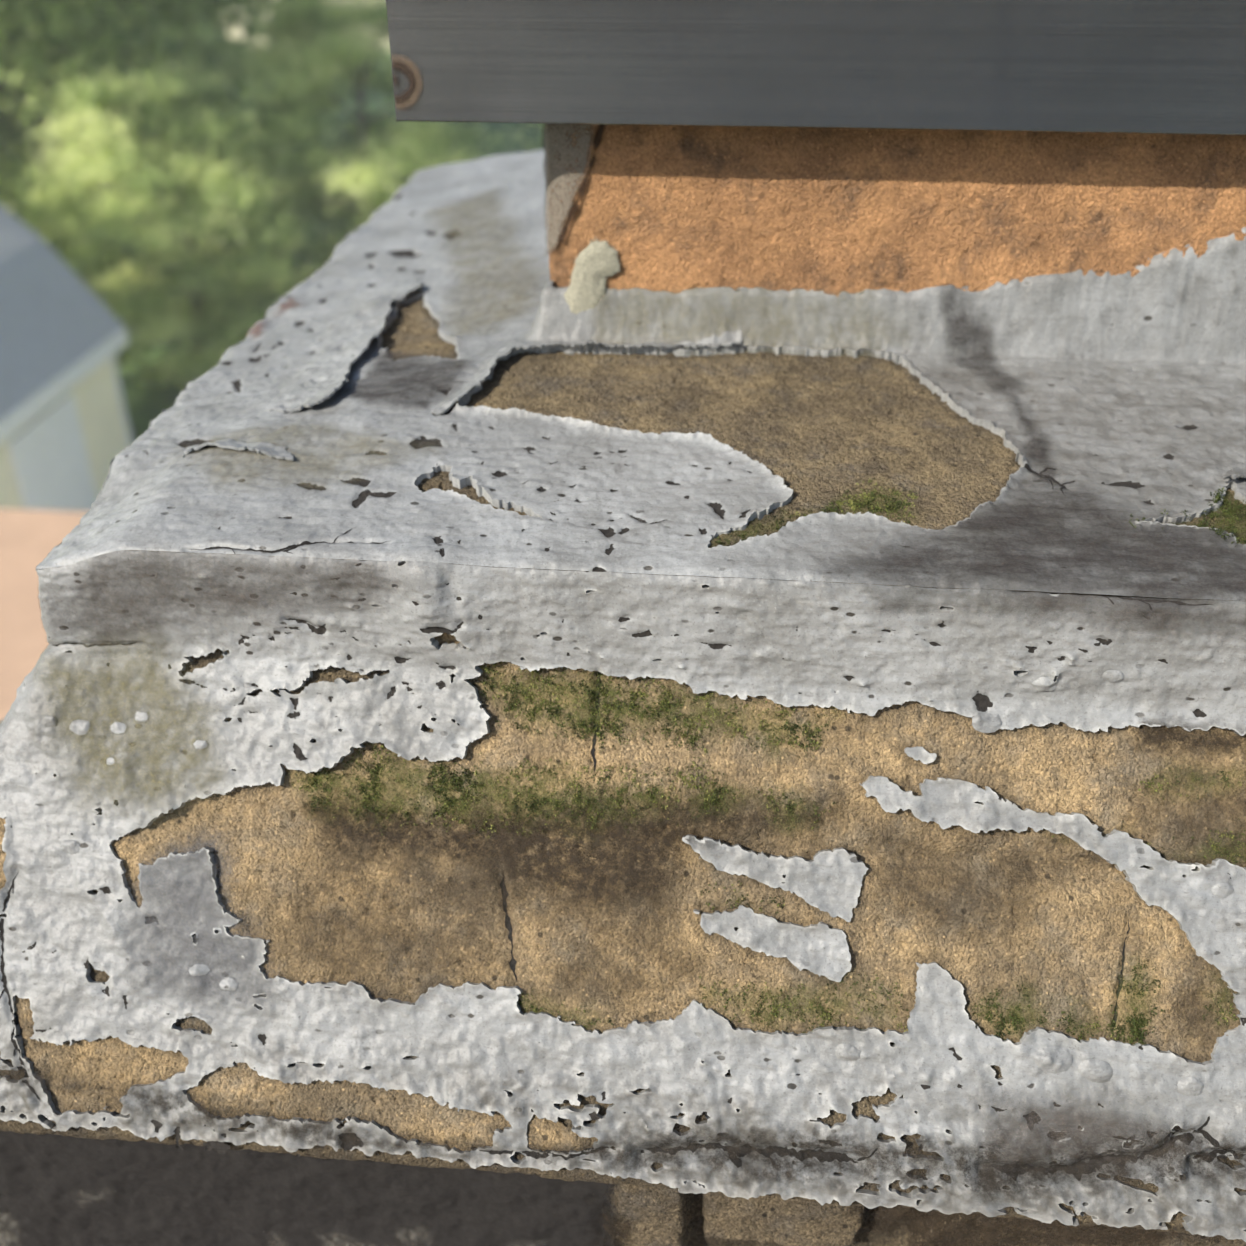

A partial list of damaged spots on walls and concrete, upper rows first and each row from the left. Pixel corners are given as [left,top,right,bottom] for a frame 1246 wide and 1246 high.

peeling [220,249,458,414]
water stain [948,295,1015,390]
peeling [418,298,1021,548]
water stain [1018,405,1053,474]
peeling [340,477,396,508]
peeling [591,514,665,572]
peeling [179,618,359,688]
peeling [420,621,464,645]
peeling [111,638,1246,1063]
crack [0,870,41,1102]
peeling [15,995,189,1113]
peeling [186,1062,511,1151]